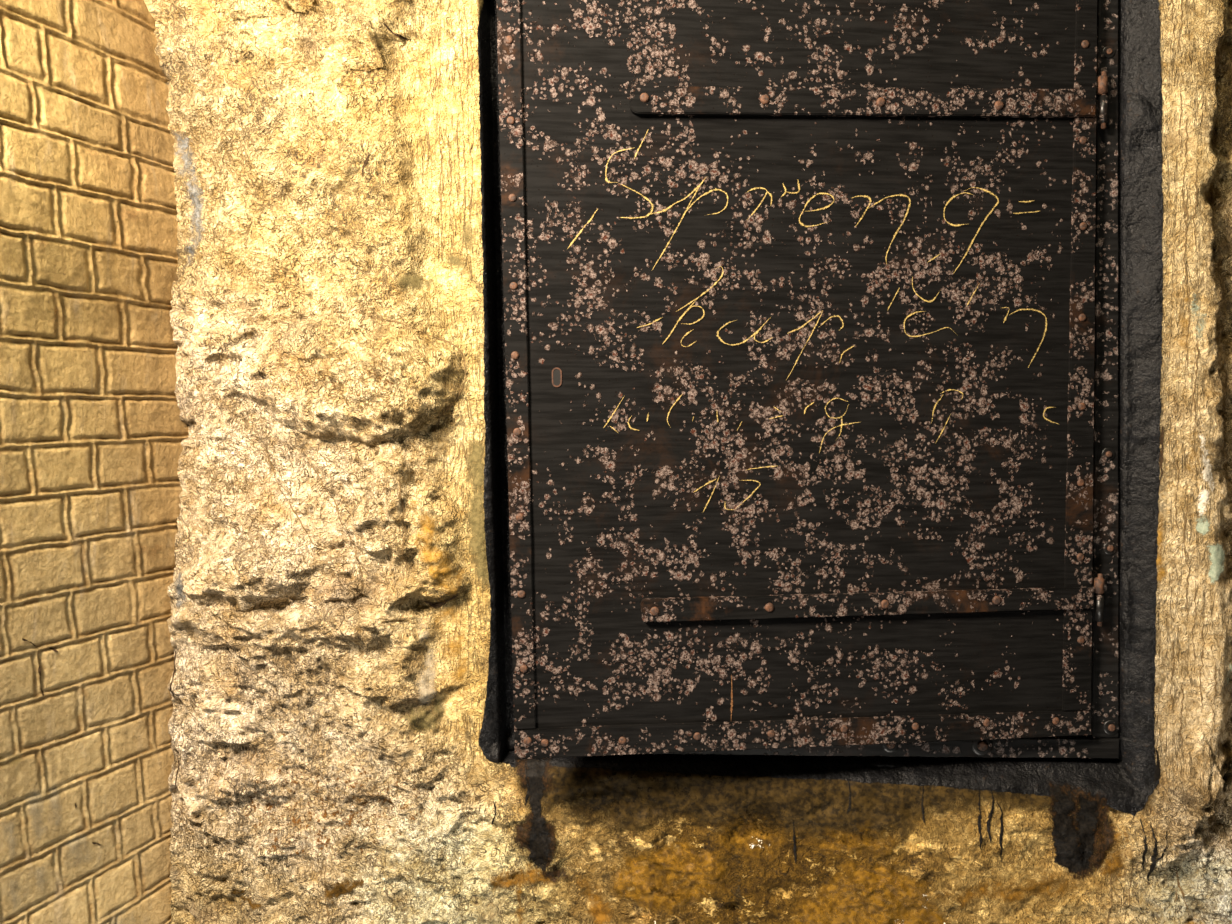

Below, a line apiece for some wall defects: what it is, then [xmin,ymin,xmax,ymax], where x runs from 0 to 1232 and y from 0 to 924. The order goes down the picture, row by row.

corrosion [491,864,551,924]
corrosion [585,890,611,924]